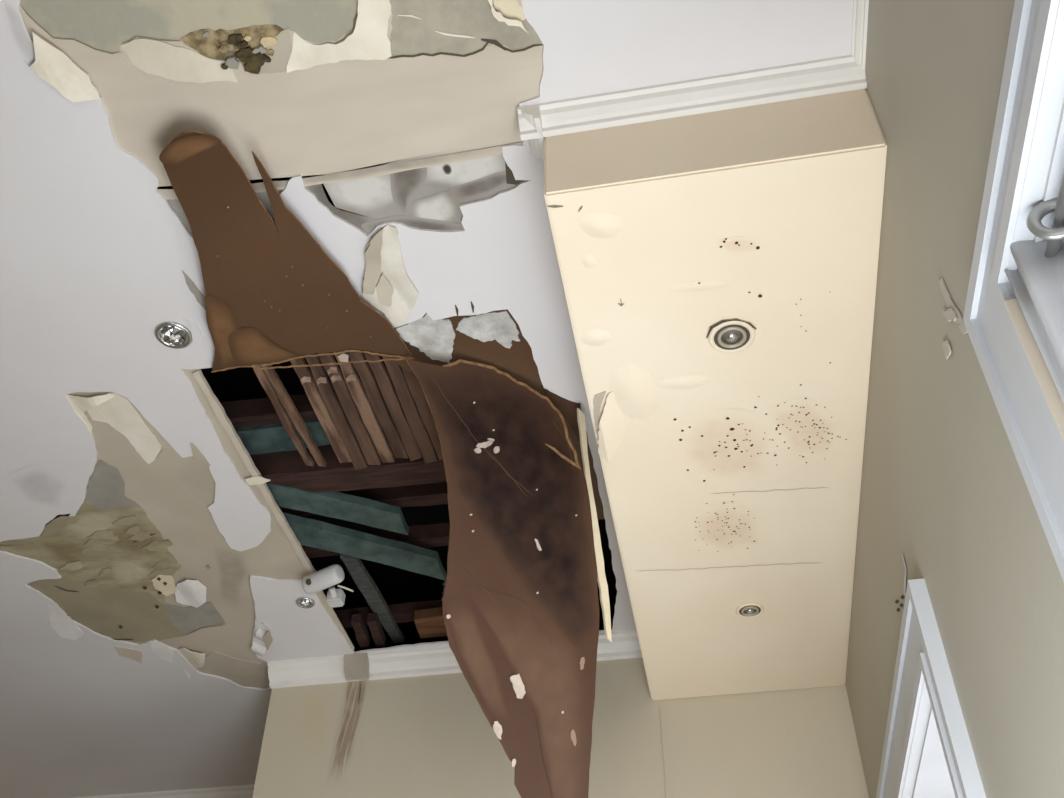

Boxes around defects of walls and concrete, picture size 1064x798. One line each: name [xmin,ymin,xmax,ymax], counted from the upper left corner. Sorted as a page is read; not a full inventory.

peeling [20,0,544,236]
spalling [0,369,316,689]
peeling [474,429,500,454]
damp [673,384,847,554]
damp [296,652,370,788]
spalling [317,590,355,650]
peeling [493,721,502,740]
peeling [510,674,526,699]